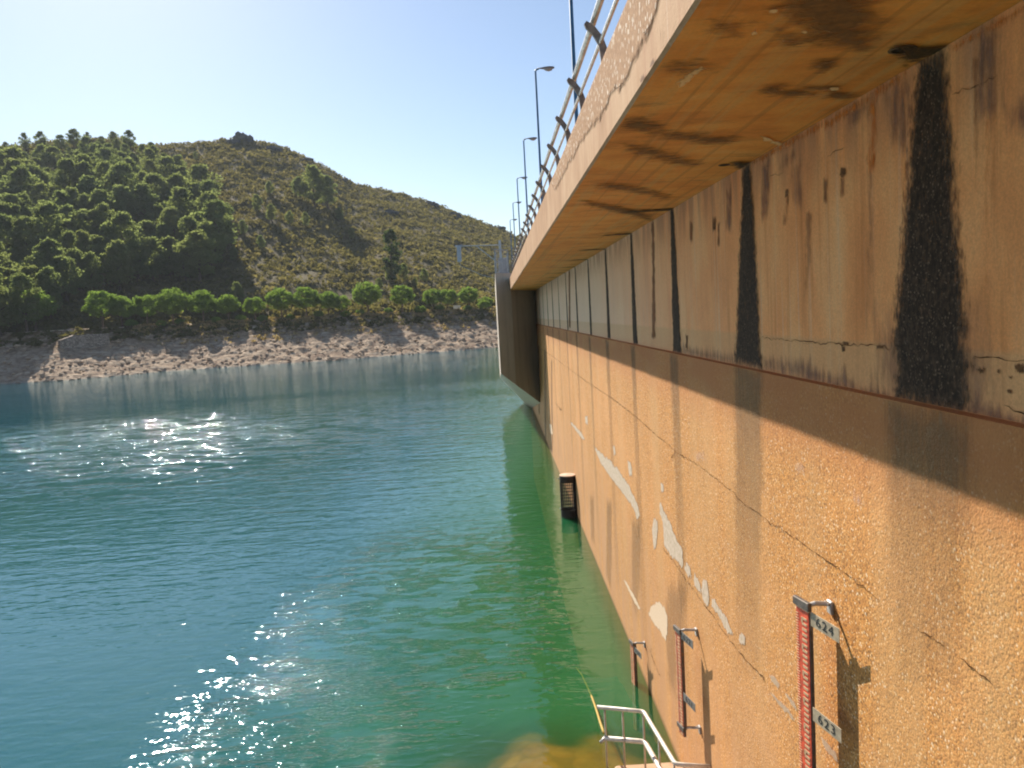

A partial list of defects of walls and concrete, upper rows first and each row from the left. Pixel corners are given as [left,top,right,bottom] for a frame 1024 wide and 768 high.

damp [777,0,883,51]
damp [625,118,734,145]
damp [764,85,858,120]
damp [892,45,974,410]
damp [589,185,684,360]
damp [712,162,783,415]
crack [762,336,891,350]
peeling [595,446,640,519]
peeling [652,484,745,645]
peeling [624,580,667,641]
crack [921,632,991,683]